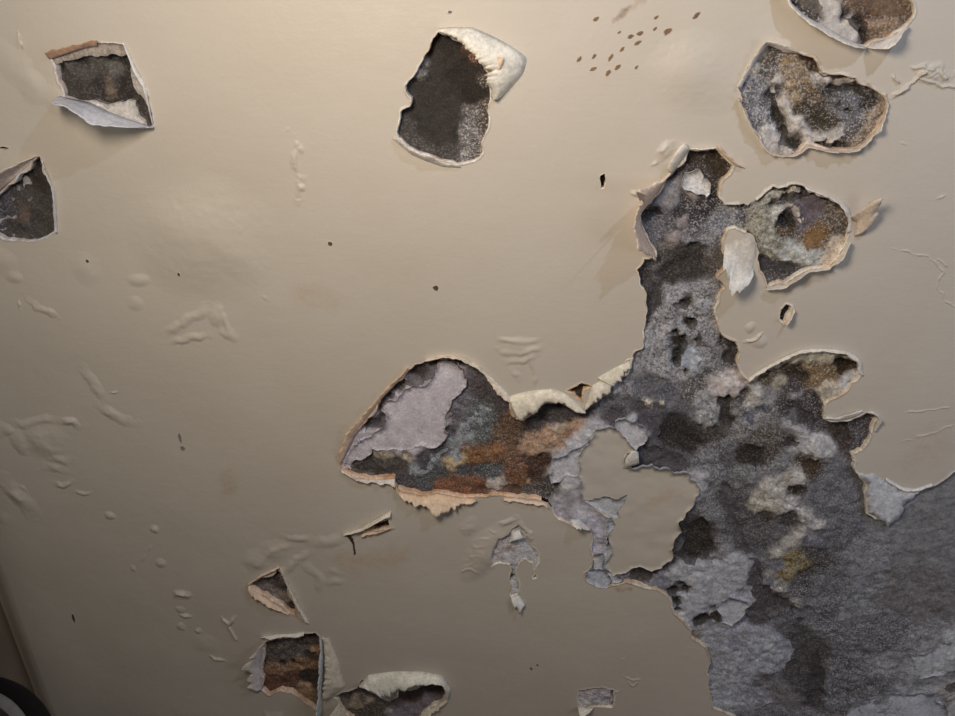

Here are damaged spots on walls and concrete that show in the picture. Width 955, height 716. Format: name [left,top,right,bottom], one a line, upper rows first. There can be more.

spalling [787,0,918,49]
spalling [45,40,156,130]
spalling [393,27,527,168]
spalling [737,41,889,158]
spalling [0,155,58,243]
spalling [599,173,607,190]
flaking render [615,147,955,716]
spalling [338,355,750,716]
spalling [241,566,451,716]